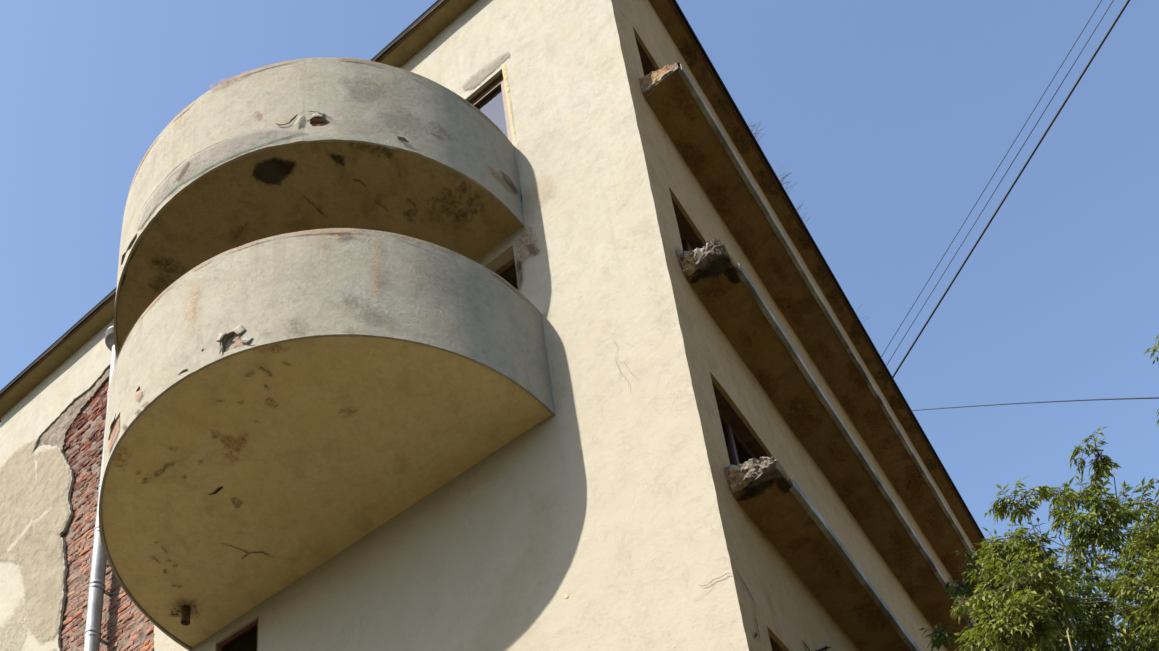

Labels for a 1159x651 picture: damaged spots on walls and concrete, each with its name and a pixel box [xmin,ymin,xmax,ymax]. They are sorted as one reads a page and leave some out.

spalling [310,112,328,126]
peeling [122,129,298,285]
spalling [677,238,739,284]
spalling [216,325,254,352]
spalling [724,455,790,501]
peeling [35,368,125,651]
crack [221,543,274,559]
peeling [99,560,155,651]